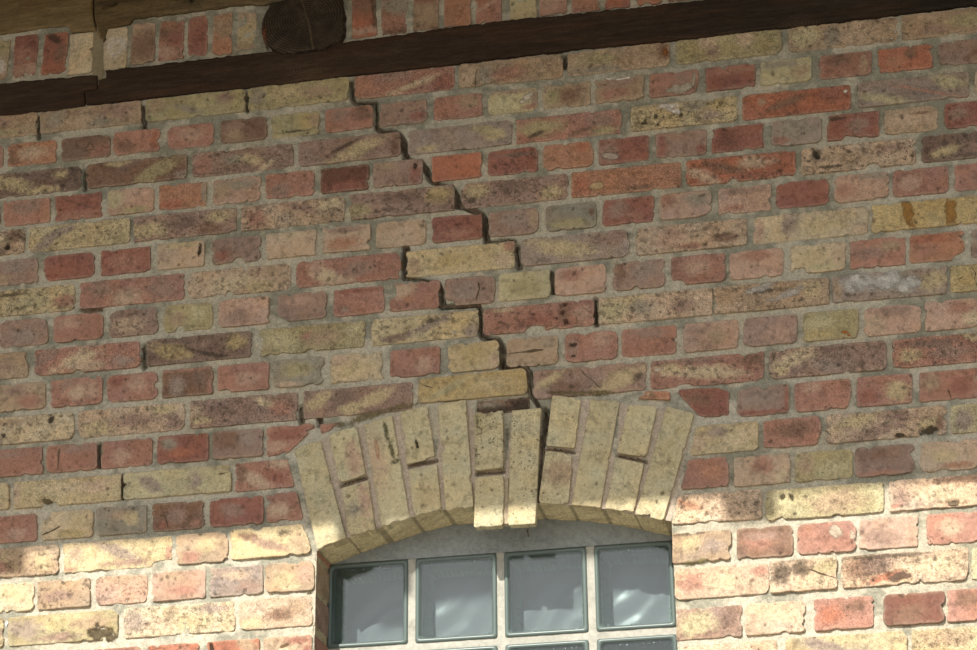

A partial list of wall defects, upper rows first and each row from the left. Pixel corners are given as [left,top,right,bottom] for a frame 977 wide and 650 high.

crack [350,82,520,268]
crack [402,249,549,499]
crack [592,300,600,326]